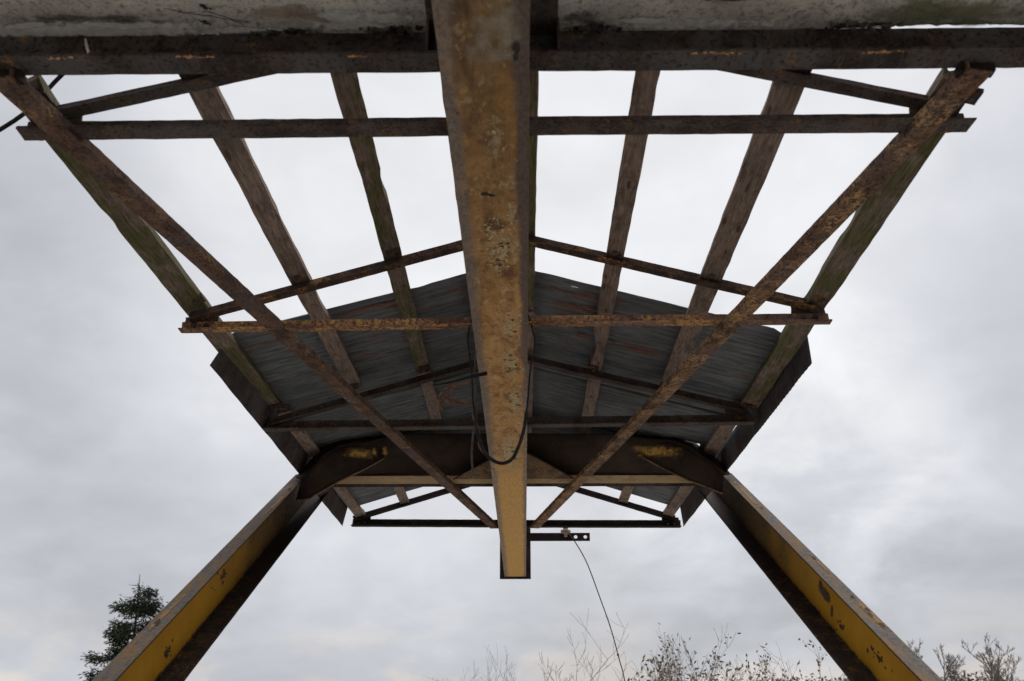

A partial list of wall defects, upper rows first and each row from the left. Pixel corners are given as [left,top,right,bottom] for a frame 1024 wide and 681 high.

peeling [851,594,886,628]